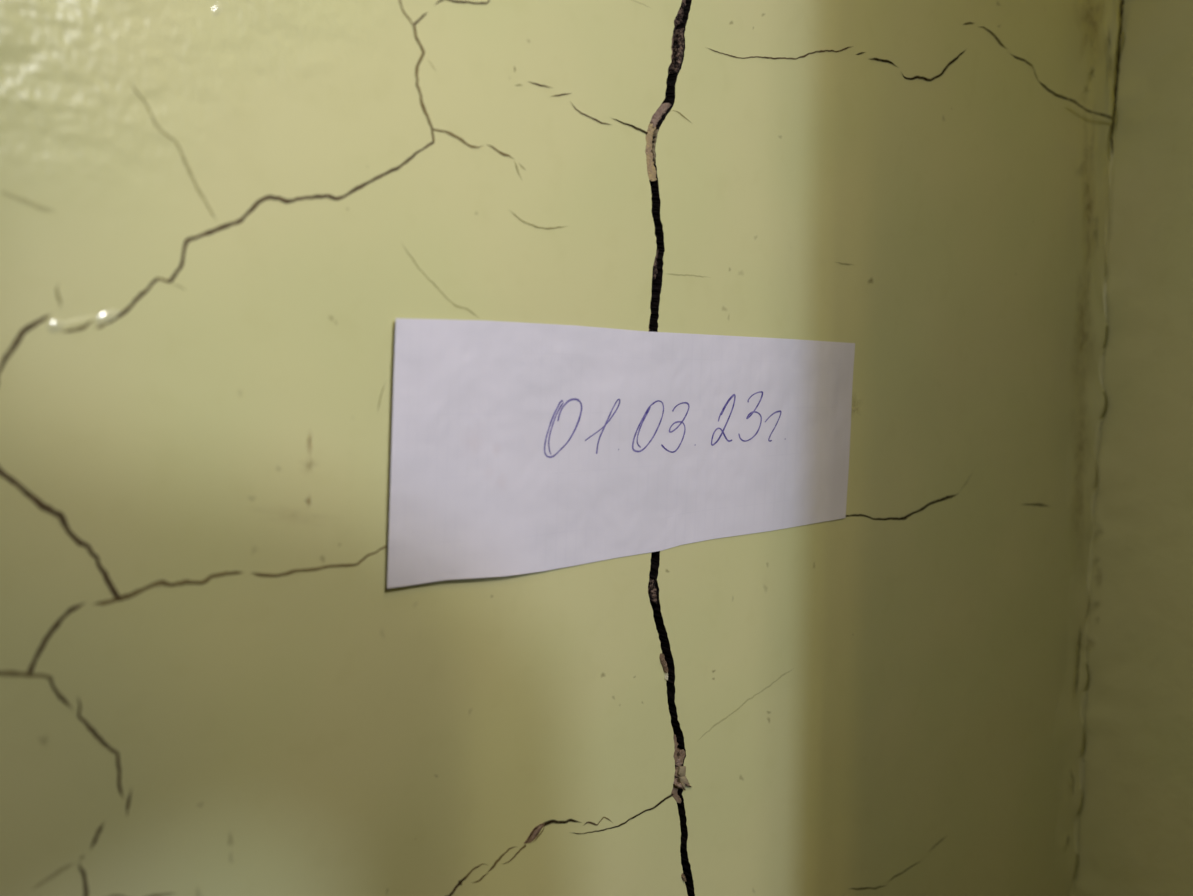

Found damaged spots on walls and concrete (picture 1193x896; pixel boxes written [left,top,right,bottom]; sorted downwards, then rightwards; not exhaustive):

crack [0,0,519,372]
crack [517,0,1124,332]
crack [79,827,102,896]
crack [0,467,387,812]
crack [449,551,695,896]